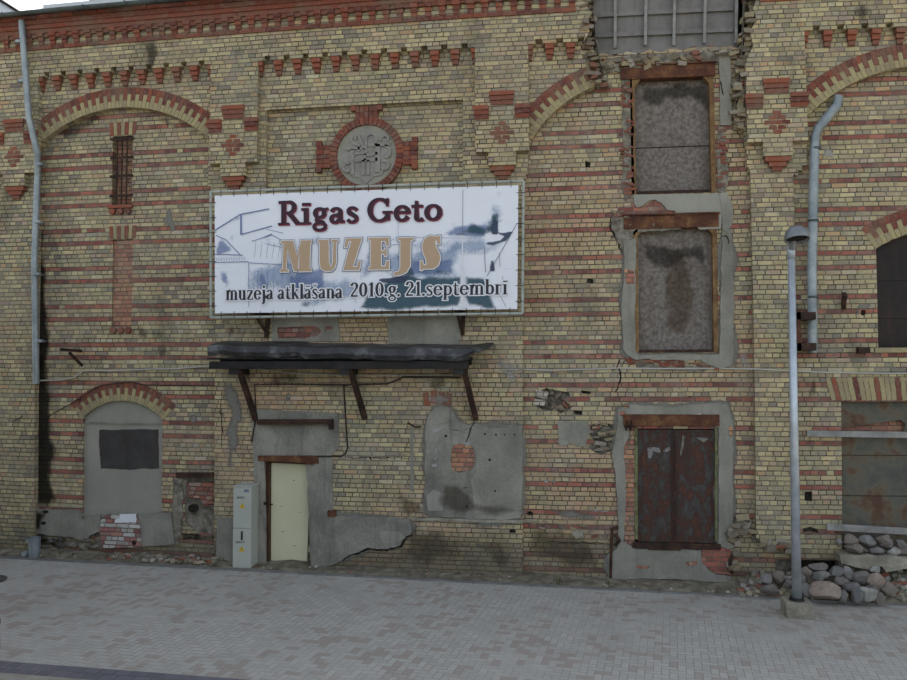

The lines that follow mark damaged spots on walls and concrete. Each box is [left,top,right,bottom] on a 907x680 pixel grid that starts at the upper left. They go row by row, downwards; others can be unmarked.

spalling [579,0,757,372]
water stain [36,261,55,546]
spalling [36,509,102,542]
spalling [132,472,214,547]
spalling [311,511,416,567]
spalling [422,388,752,583]